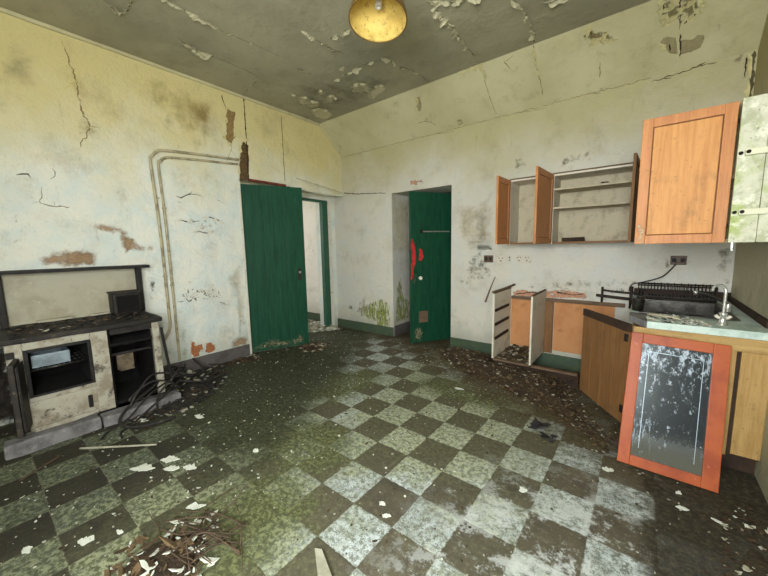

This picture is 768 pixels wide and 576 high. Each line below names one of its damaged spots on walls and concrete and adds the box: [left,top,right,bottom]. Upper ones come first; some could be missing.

peeling [425,0,481,55]
peeling [656,0,706,56]
crack [65,50,93,147]
peeling [286,90,337,120]
peeling [334,57,428,100]
crack [345,54,717,157]
crack [744,51,756,97]
peeling [221,95,248,174]
flaking render [190,340,217,358]